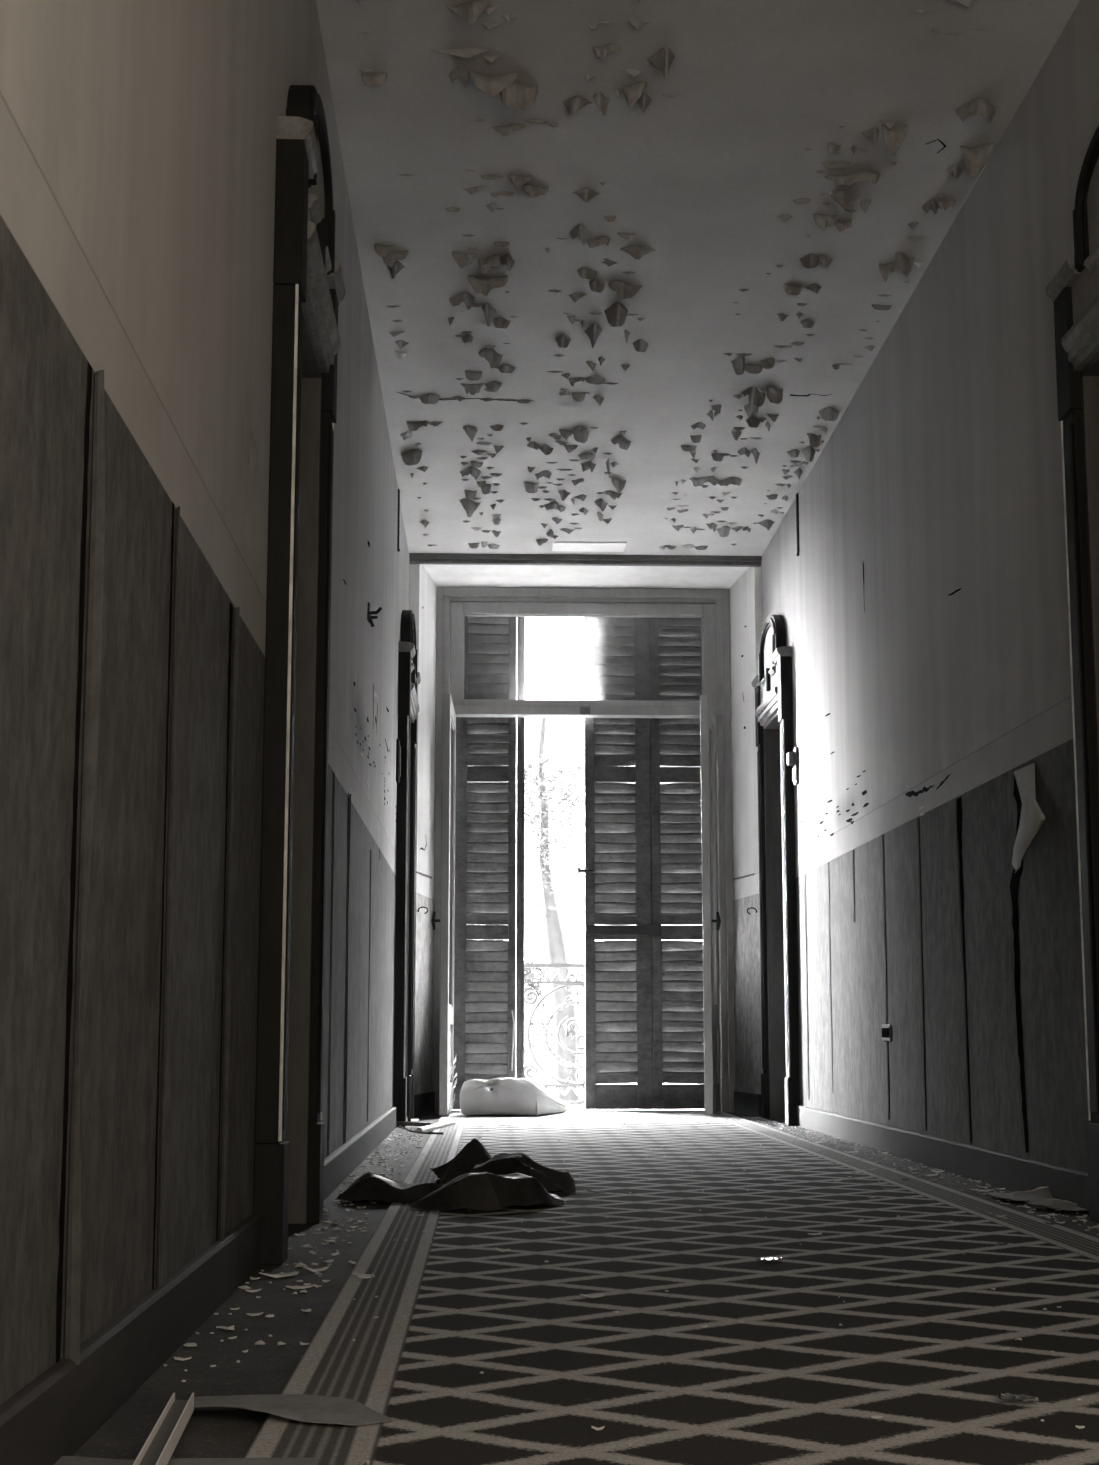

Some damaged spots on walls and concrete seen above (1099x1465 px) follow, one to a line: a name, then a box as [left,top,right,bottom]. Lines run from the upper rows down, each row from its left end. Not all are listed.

peeling [563,43,682,116]
peeling [375,244,408,279]
peeling [386,306,409,360]
peeling [400,234,531,546]
peeling [546,216,655,406]
peeling [659,121,907,550]
peeling [832,252,924,370]
peeling [460,423,631,549]